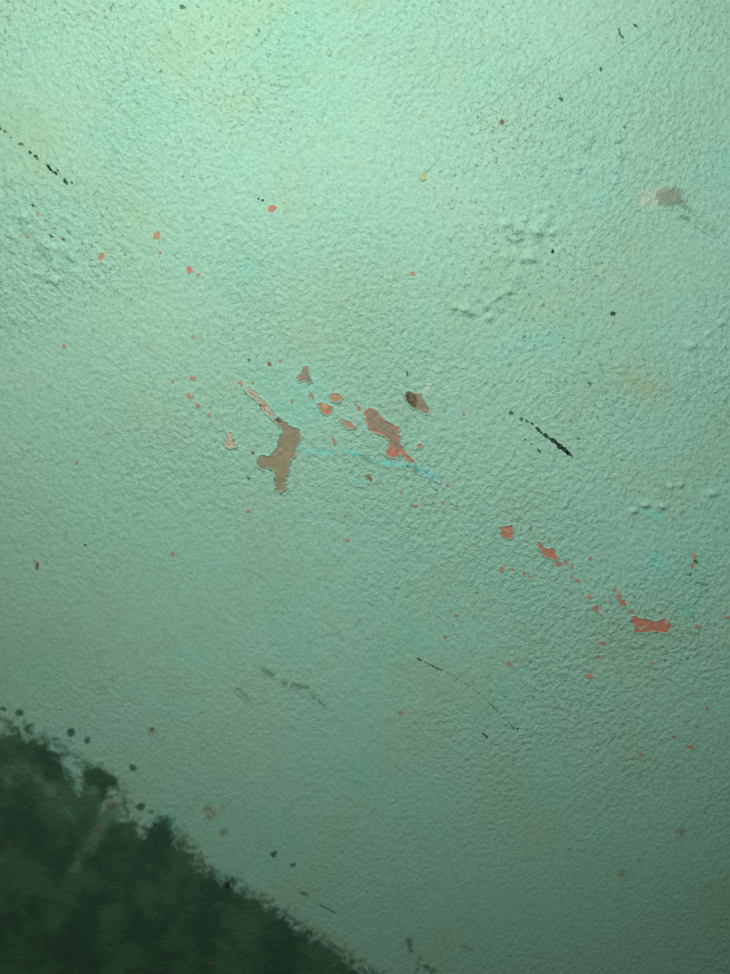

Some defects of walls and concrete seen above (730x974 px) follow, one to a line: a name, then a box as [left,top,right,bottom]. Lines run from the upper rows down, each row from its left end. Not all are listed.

peeling [238,381,303,494]
peeling [296,364,424,467]
peeling [403,389,432,416]
peeling [498,523,515,541]
peeling [535,539,580,583]
peeling [587,587,673,635]